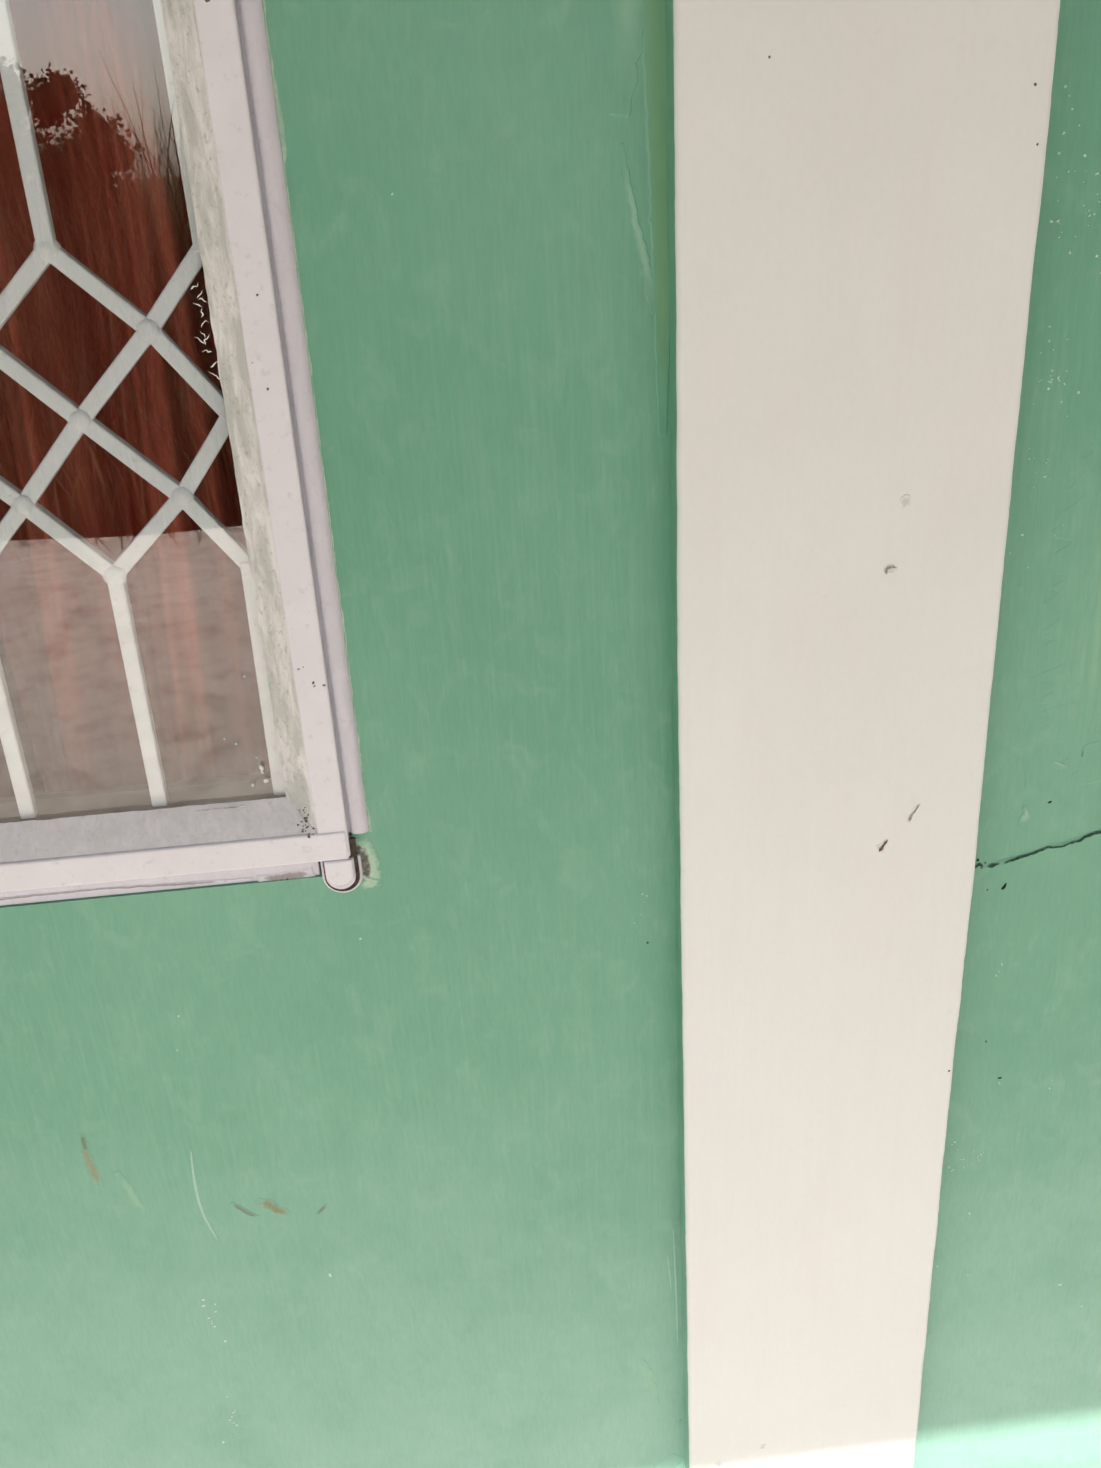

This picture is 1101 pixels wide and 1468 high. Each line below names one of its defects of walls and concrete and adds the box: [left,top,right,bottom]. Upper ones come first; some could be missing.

crack [975,828,1101,870]